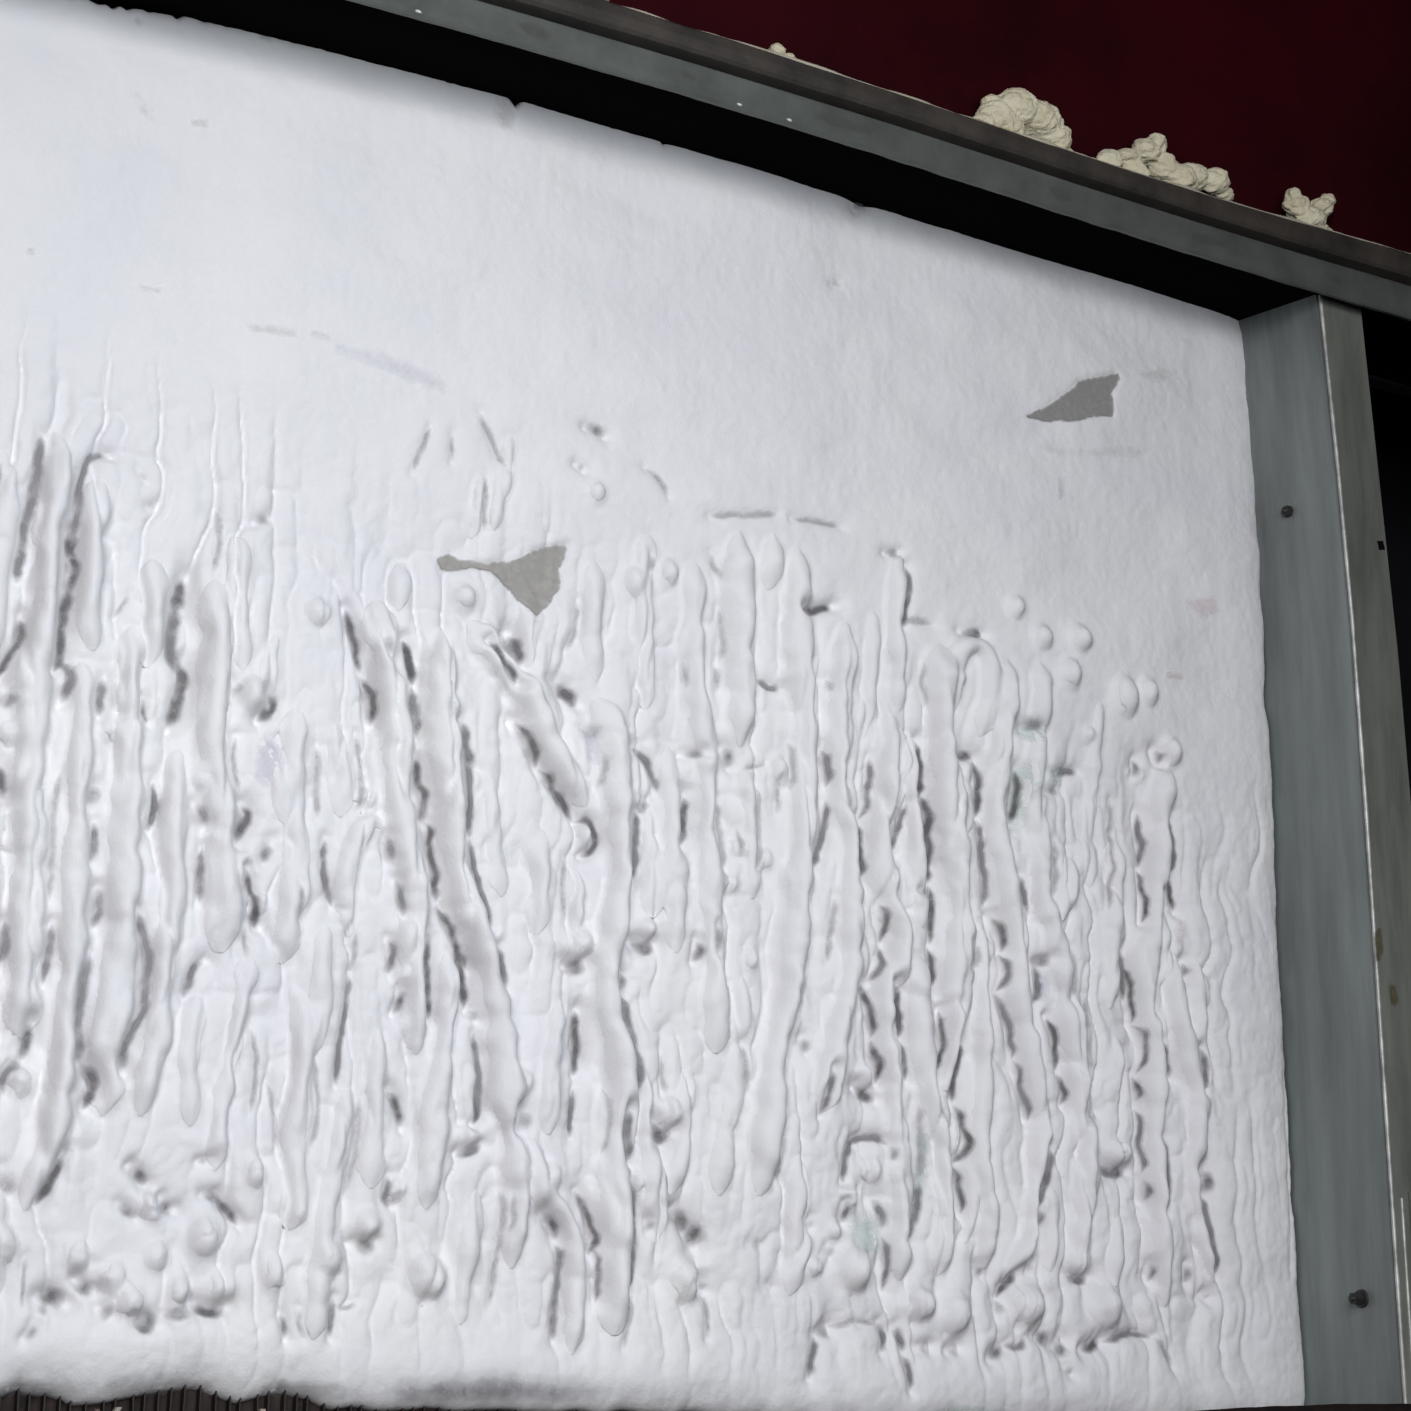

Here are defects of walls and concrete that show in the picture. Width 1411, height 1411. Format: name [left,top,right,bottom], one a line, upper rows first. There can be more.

peeling [1027,374,1119,421]
peeling [437,546,566,615]